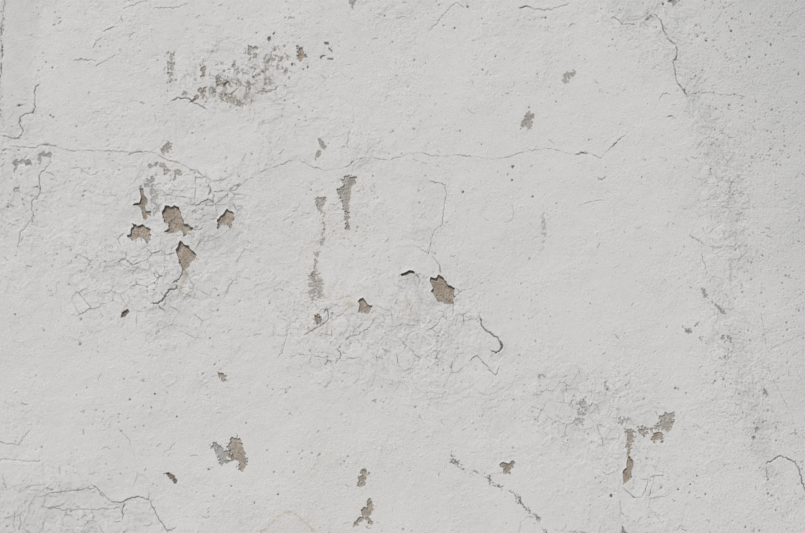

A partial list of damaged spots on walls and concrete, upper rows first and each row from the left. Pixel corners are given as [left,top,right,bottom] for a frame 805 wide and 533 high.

peeling [521,112,534,129]
flaking render [125,142,198,271]
flaking render [215,207,236,229]
flaking render [337,175,357,230]
flaking render [428,273,457,304]
flaking render [356,296,372,314]
flaking render [211,437,248,471]
flaking render [357,469,370,487]
flaking render [497,460,515,474]
flaking render [620,412,675,484]
flaking render [353,498,374,527]